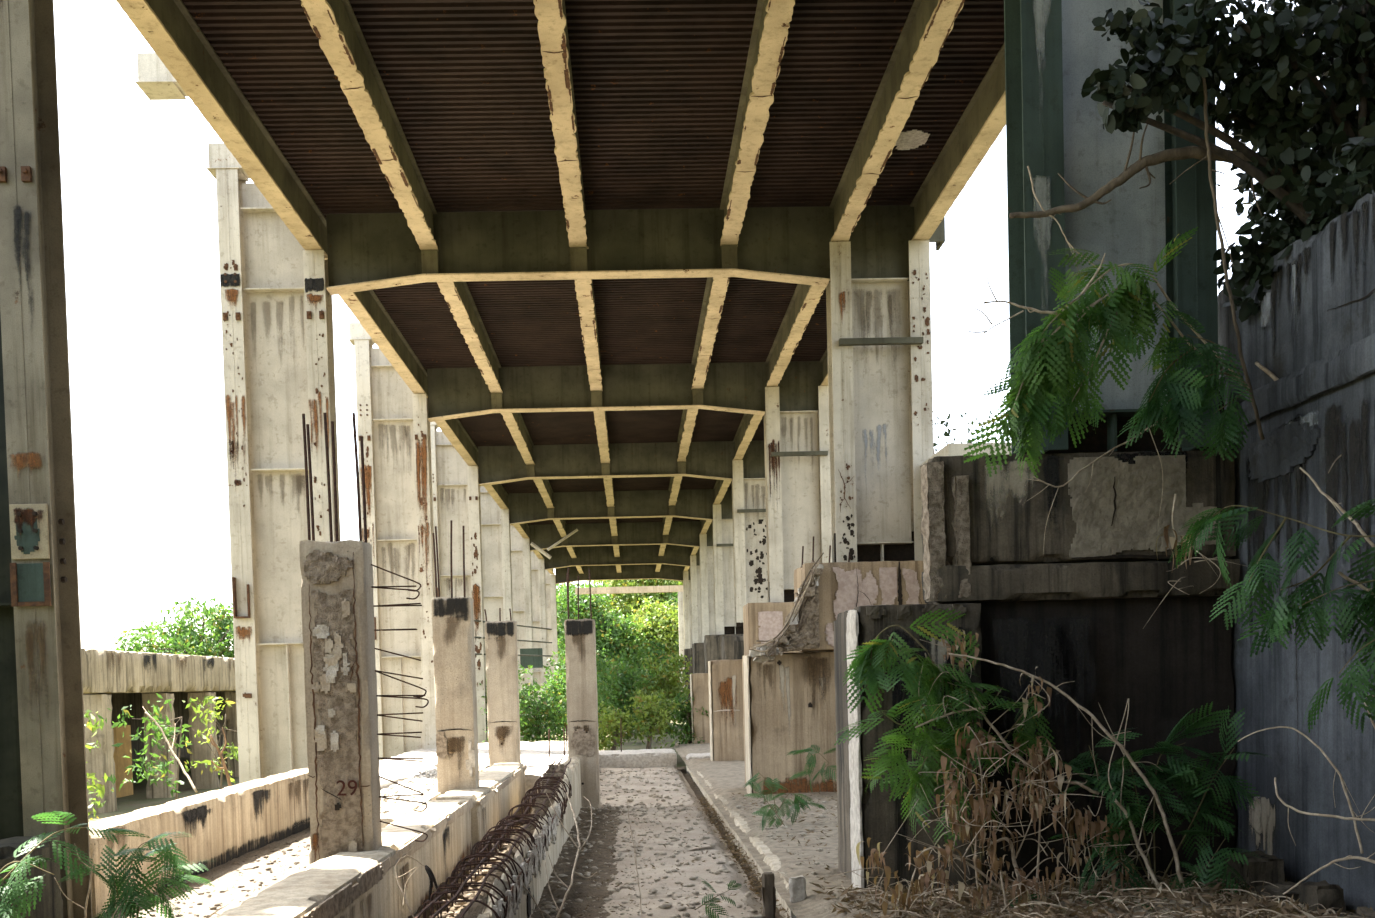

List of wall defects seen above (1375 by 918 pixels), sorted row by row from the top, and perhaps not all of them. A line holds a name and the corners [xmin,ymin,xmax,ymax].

leakage [1035,0,1044,57]
rust [225,289,238,305]
rust [226,395,246,486]
spalling [352,413,371,543]
rust [416,439,438,591]
spalling [801,461,972,646]
crack [1071,477,1217,559]
spalling [302,357,363,859]
leakage [183,805,211,837]
leakage [160,818,310,889]
leakage [253,790,270,819]
spalling [301,863,384,918]